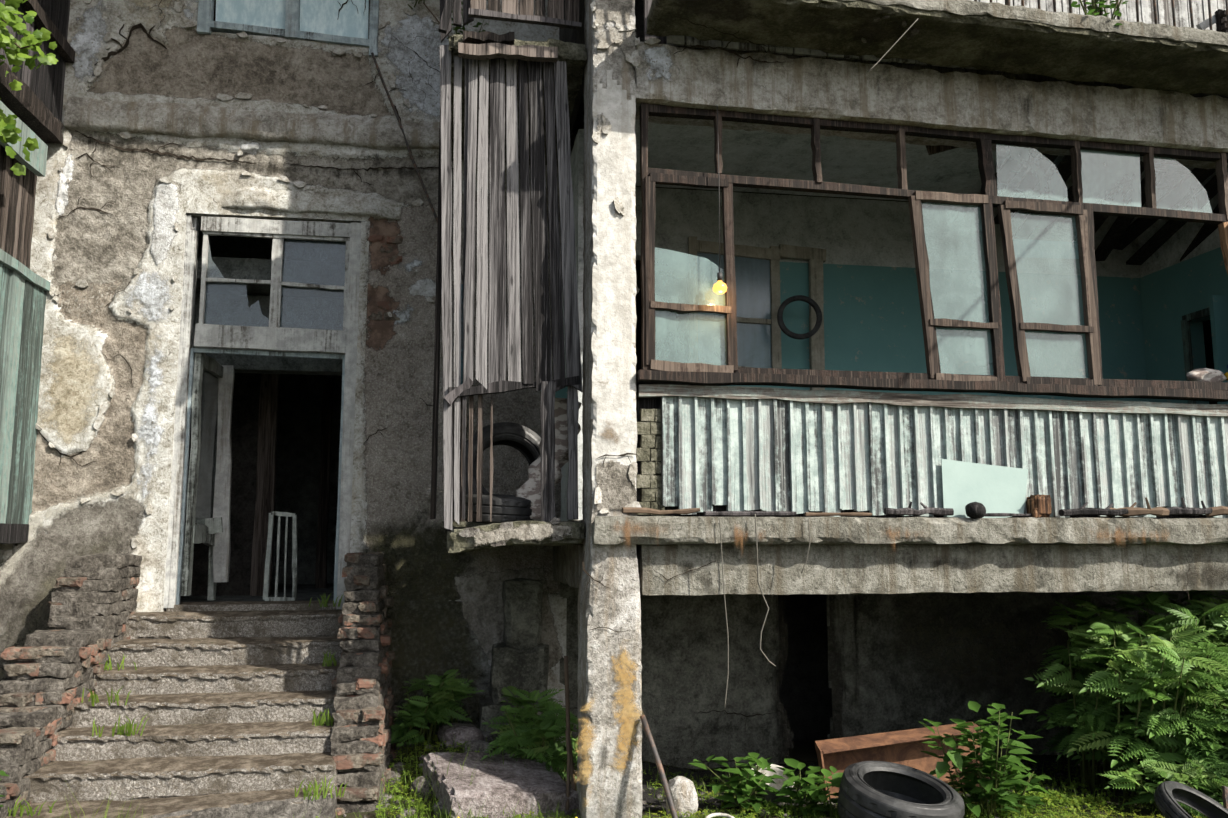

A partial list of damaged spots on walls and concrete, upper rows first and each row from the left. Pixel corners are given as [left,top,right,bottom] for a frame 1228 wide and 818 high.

crack [94,0,167,65]
peeling [70,0,463,123]
spalling [590,0,673,79]
peeling [592,113,612,144]
peeling [612,197,626,216]
peeling [32,130,573,671]
spalling [594,460,641,514]
water stain [362,510,490,743]
rust [577,701,595,793]
rust [612,650,641,770]